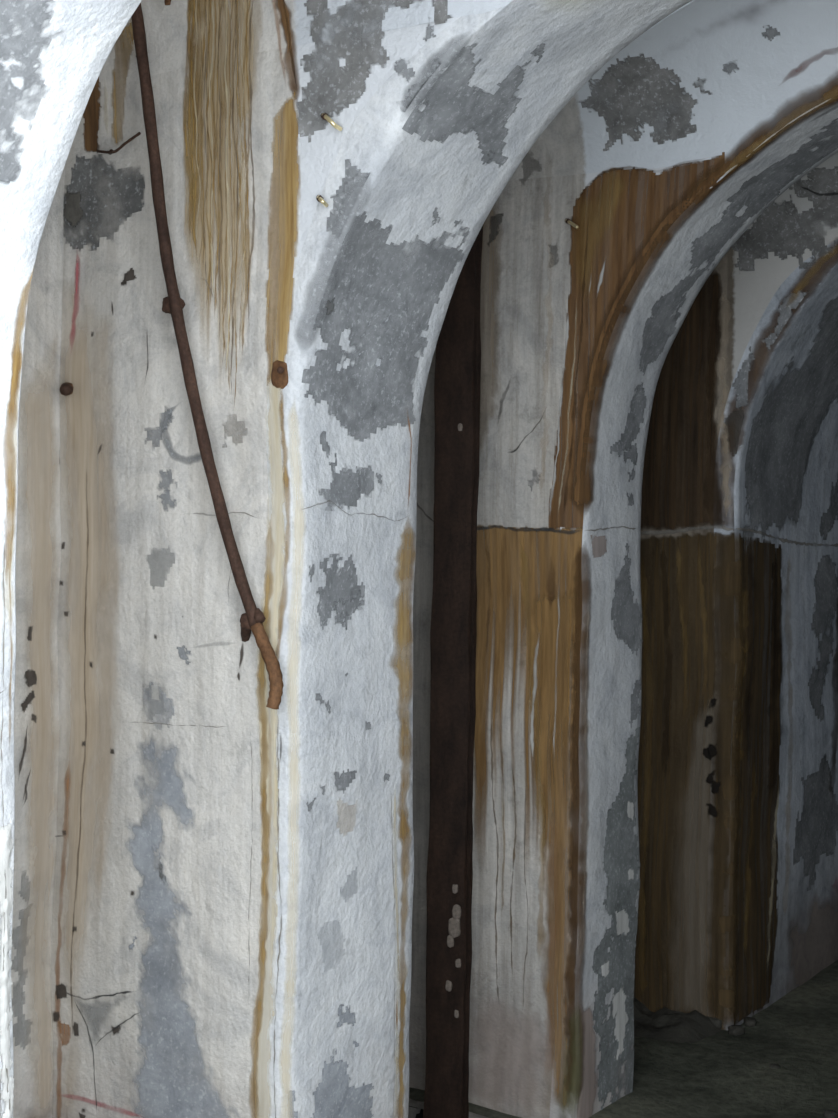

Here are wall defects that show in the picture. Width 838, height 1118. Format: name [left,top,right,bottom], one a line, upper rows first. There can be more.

peeling [0,0,54,183]
corrosion [184,0,255,403]
peeling [299,159,469,442]
peeling [580,54,712,151]
peeling [762,25,780,41]
peeling [725,290,838,551]
corrosion [251,0,299,1118]
peeling [611,543,643,655]
corrosion [474,76,838,1107]
peeling [808,555,838,722]
peeling [592,680,641,1110]
peeling [793,754,838,891]